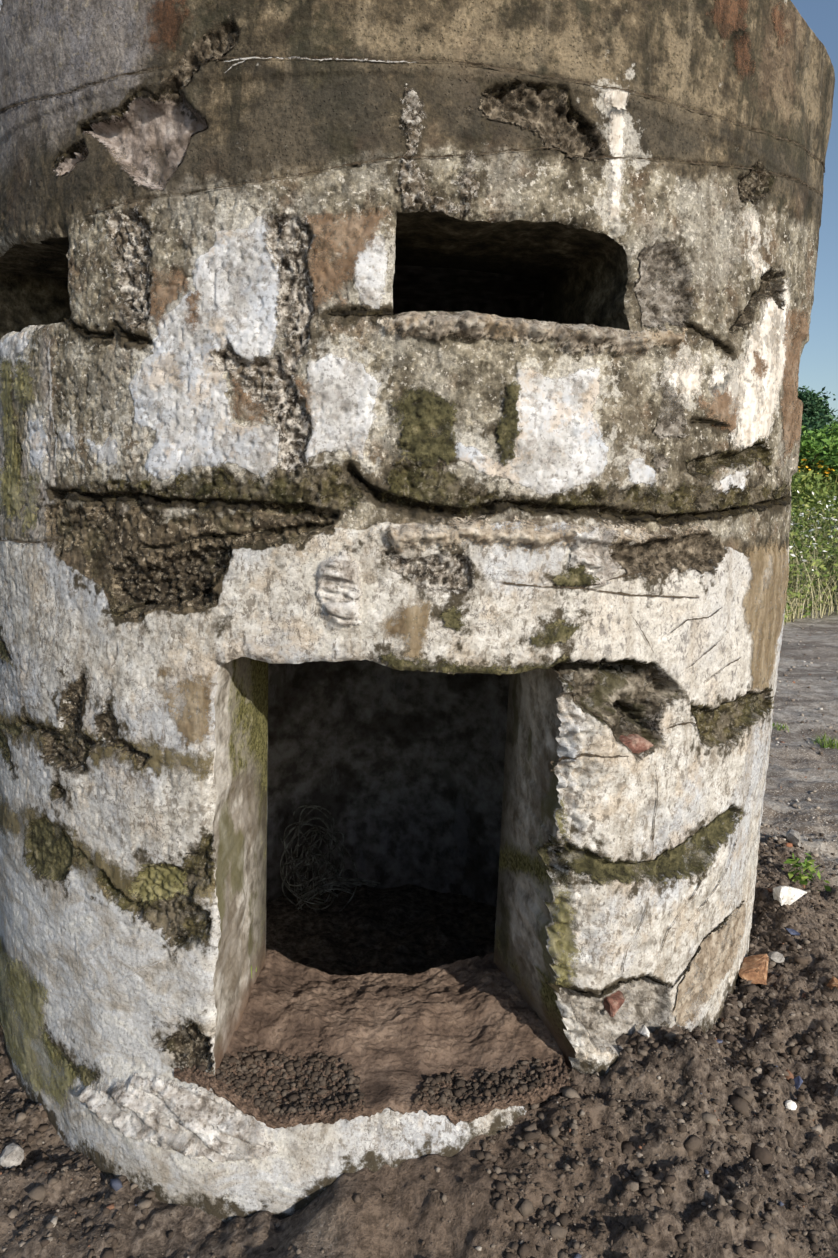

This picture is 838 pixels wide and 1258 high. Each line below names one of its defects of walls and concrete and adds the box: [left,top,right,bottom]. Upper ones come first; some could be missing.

spalling [53,13,240,190]
crack [0,56,825,215]
spalling [468,80,607,164]
peeling [0,331,29,366]
peeling [28,206,381,628]
peeling [354,235,388,309]
peeling [380,367,791,594]
spalling [633,241,698,331]
spalling [729,267,787,334]
spalling [551,658,774,760]
crack [546,840,745,998]
spalling [555,903,746,1055]